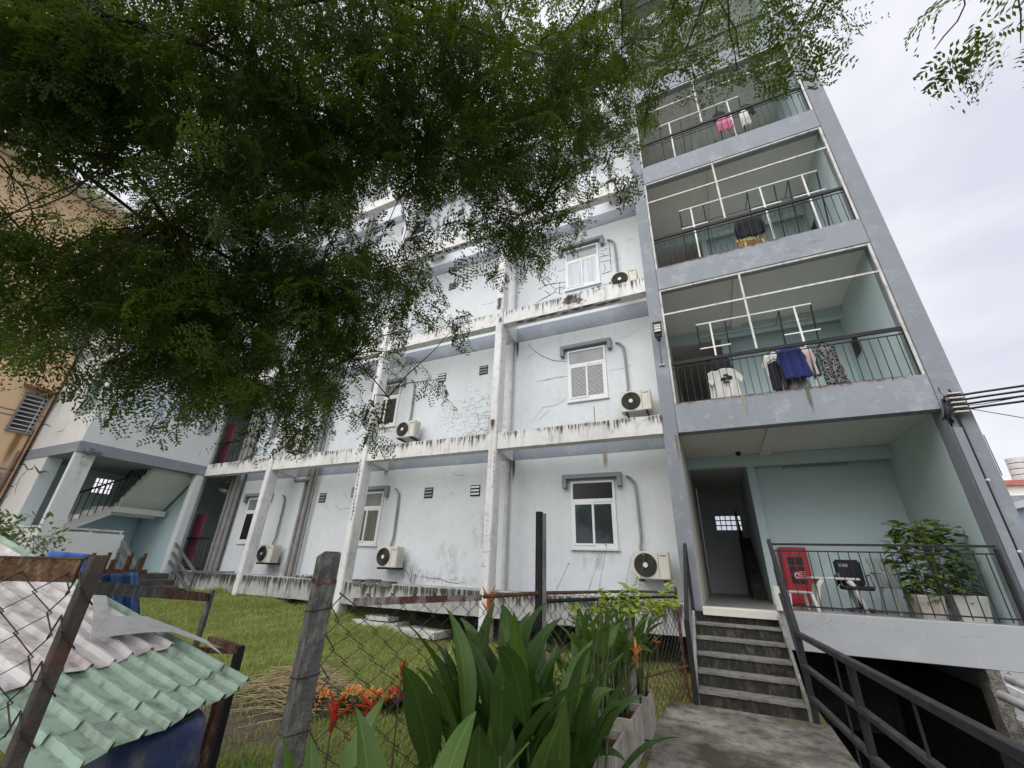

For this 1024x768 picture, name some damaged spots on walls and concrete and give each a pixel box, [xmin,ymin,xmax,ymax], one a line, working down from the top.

crack [539,269,566,301]
crack [529,345,568,422]
crack [440,389,508,436]
damp [538,418,635,432]
damp [212,419,494,468]
damp [170,570,311,590]
damp [335,581,479,602]